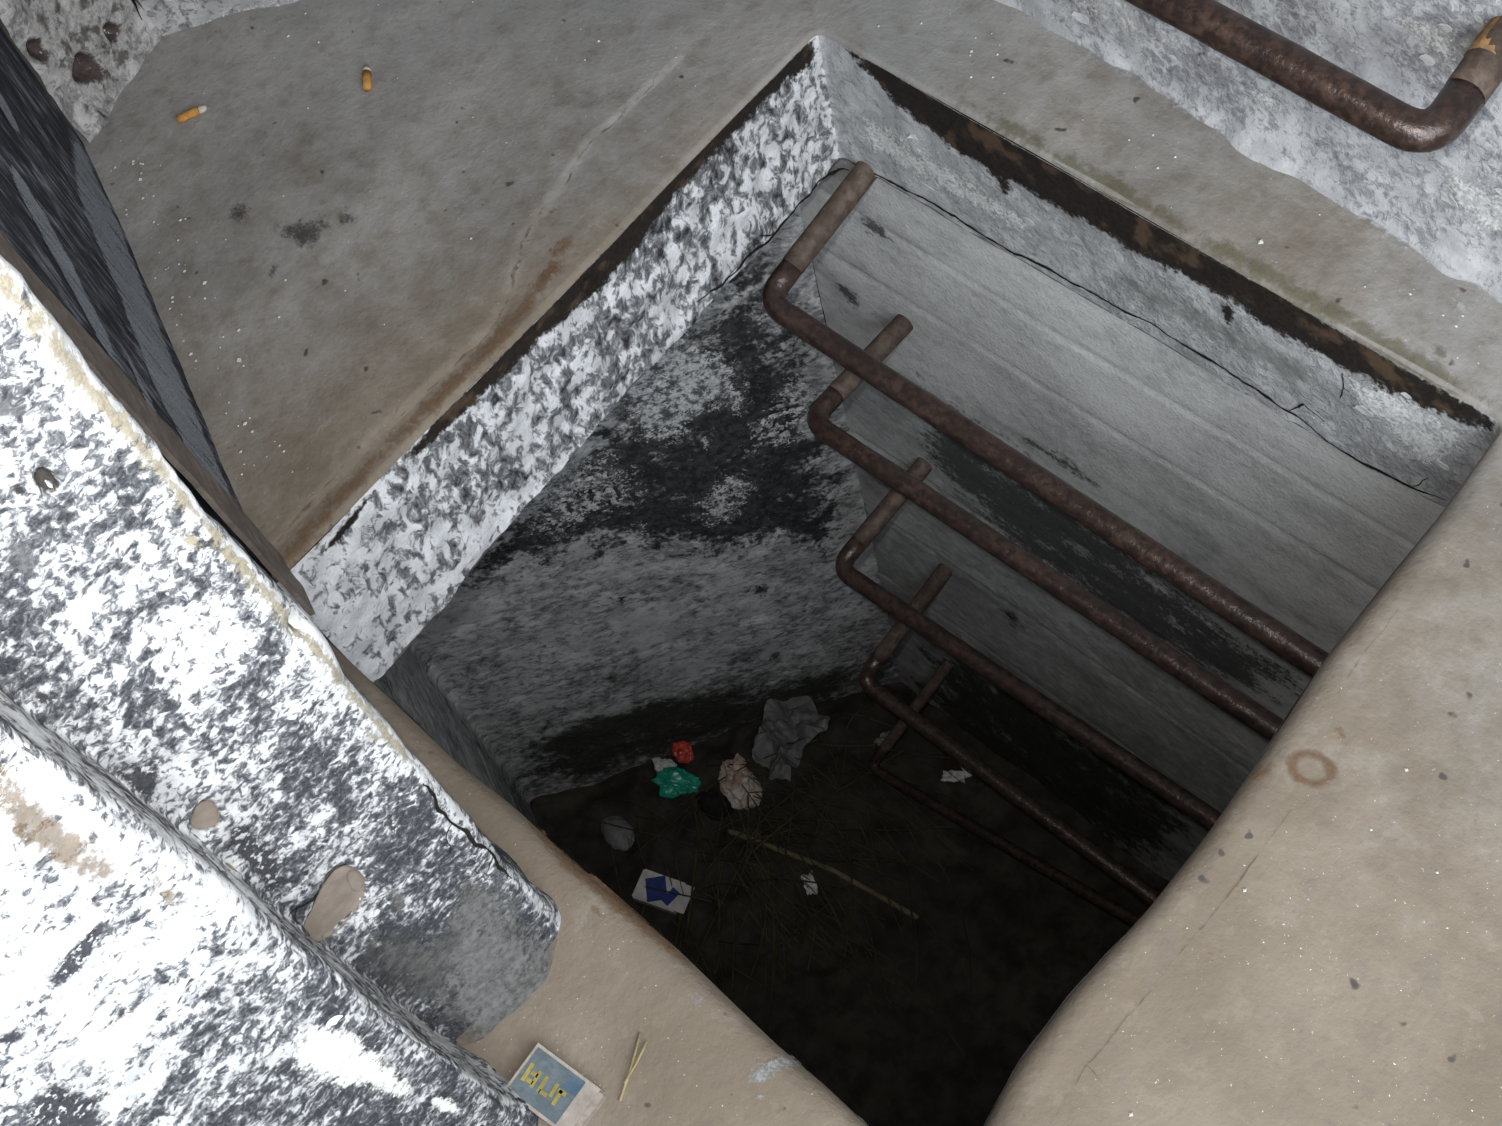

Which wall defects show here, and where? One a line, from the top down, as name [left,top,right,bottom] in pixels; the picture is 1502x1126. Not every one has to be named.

water stain [411,39,815,455]
crack [697,161,1446,501]
water stain [325,500,367,552]
peeling [118,761,159,803]
rust [1288,752,1336,786]
peeling [190,800,284,909]
spalling [304,865,365,942]